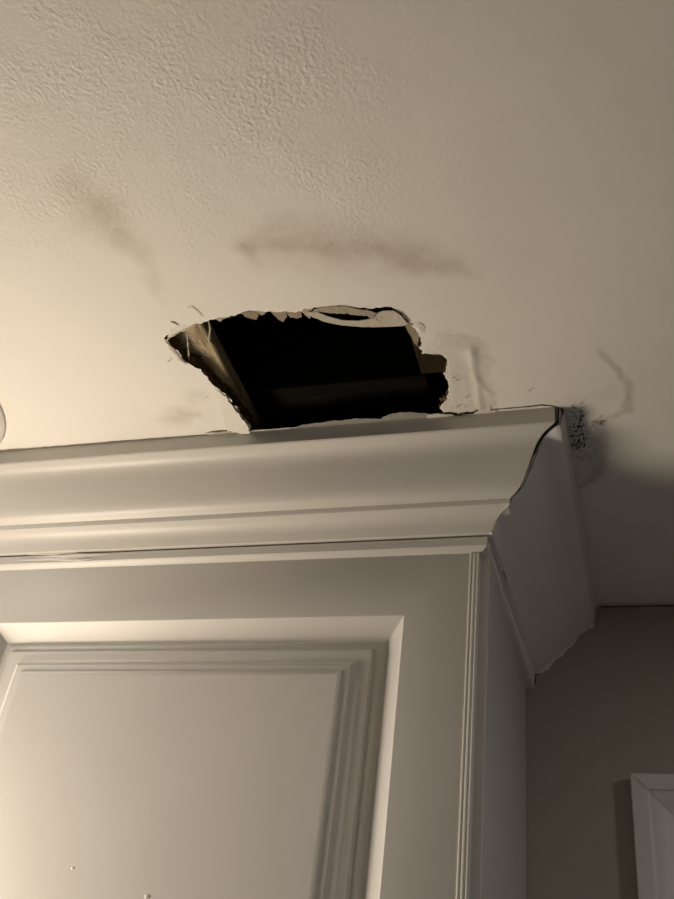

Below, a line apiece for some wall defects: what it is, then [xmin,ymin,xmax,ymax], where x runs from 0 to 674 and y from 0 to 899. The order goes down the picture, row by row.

peeling [216,306,377,322]
peeling [164,325,195,364]
peeling [405,322,420,350]